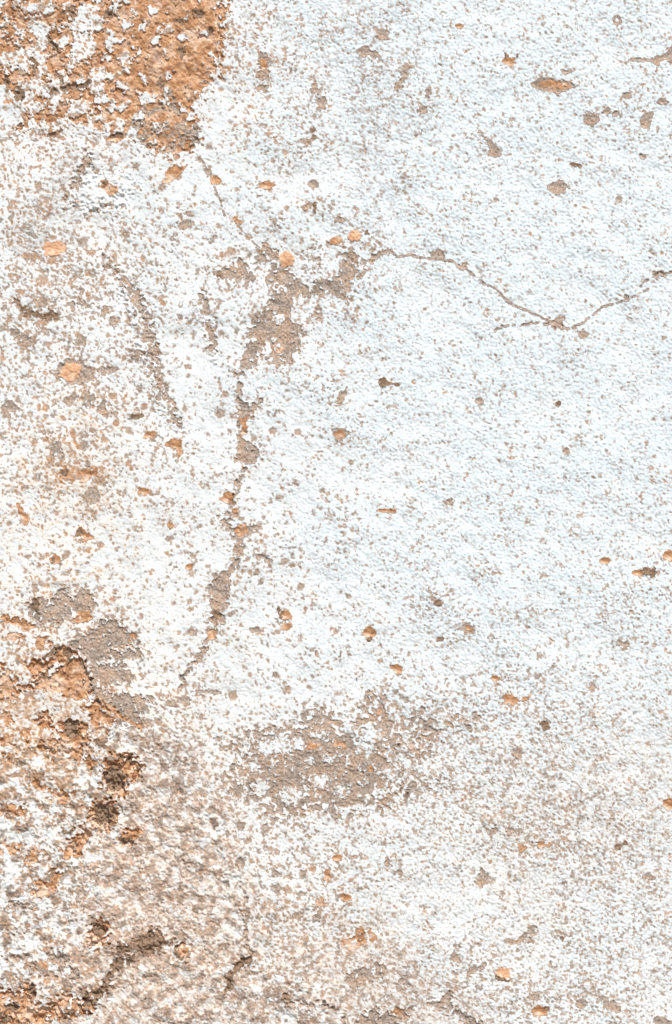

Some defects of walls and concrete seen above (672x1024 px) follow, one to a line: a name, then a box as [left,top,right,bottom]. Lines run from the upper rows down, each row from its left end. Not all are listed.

spalling [0,0,230,184]
crack [197,156,258,247]
crack [296,242,330,255]
crack [376,240,672,333]
peeling [0,586,153,792]
spalling [0,803,28,822]
spalling [31,778,77,806]
spalling [93,804,118,825]
peeling [213,690,481,844]
spalling [0,840,64,911]
hole [90,920,106,946]
spalling [0,947,97,1024]